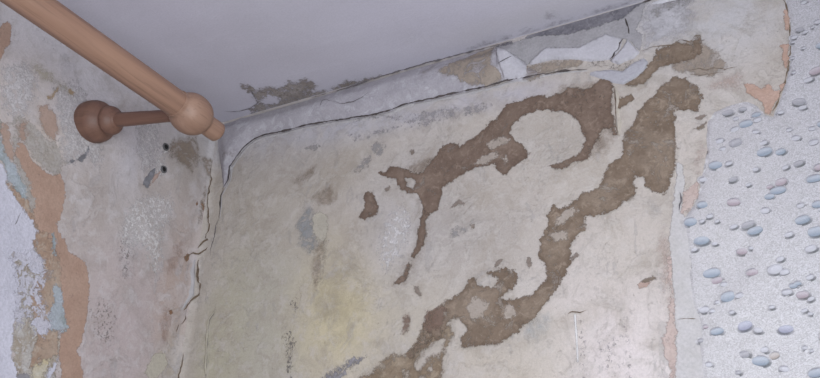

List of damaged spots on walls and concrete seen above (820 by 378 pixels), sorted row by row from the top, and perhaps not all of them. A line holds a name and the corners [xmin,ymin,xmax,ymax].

flaking render [0,21,11,59]
flaking render [496,2,702,84]
flaking render [39,105,58,140]
crack [176,41,587,332]
flaking render [0,121,90,378]